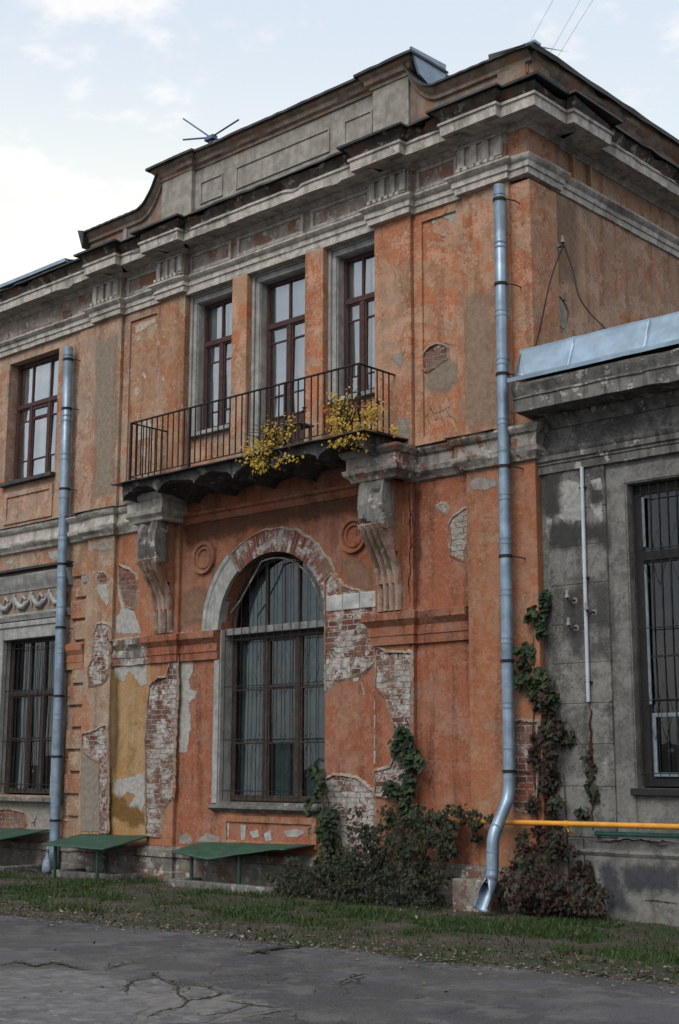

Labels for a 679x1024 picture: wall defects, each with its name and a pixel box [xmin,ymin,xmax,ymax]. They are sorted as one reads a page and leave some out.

spalling [423,341,450,374]
peeling [90,540,113,551]
spalling [435,501,468,563]
damp [539,473,609,548]
spalling [81,564,197,839]
spalling [232,526,414,855]
spalling [512,717,542,818]
peeling [0,802,51,841]